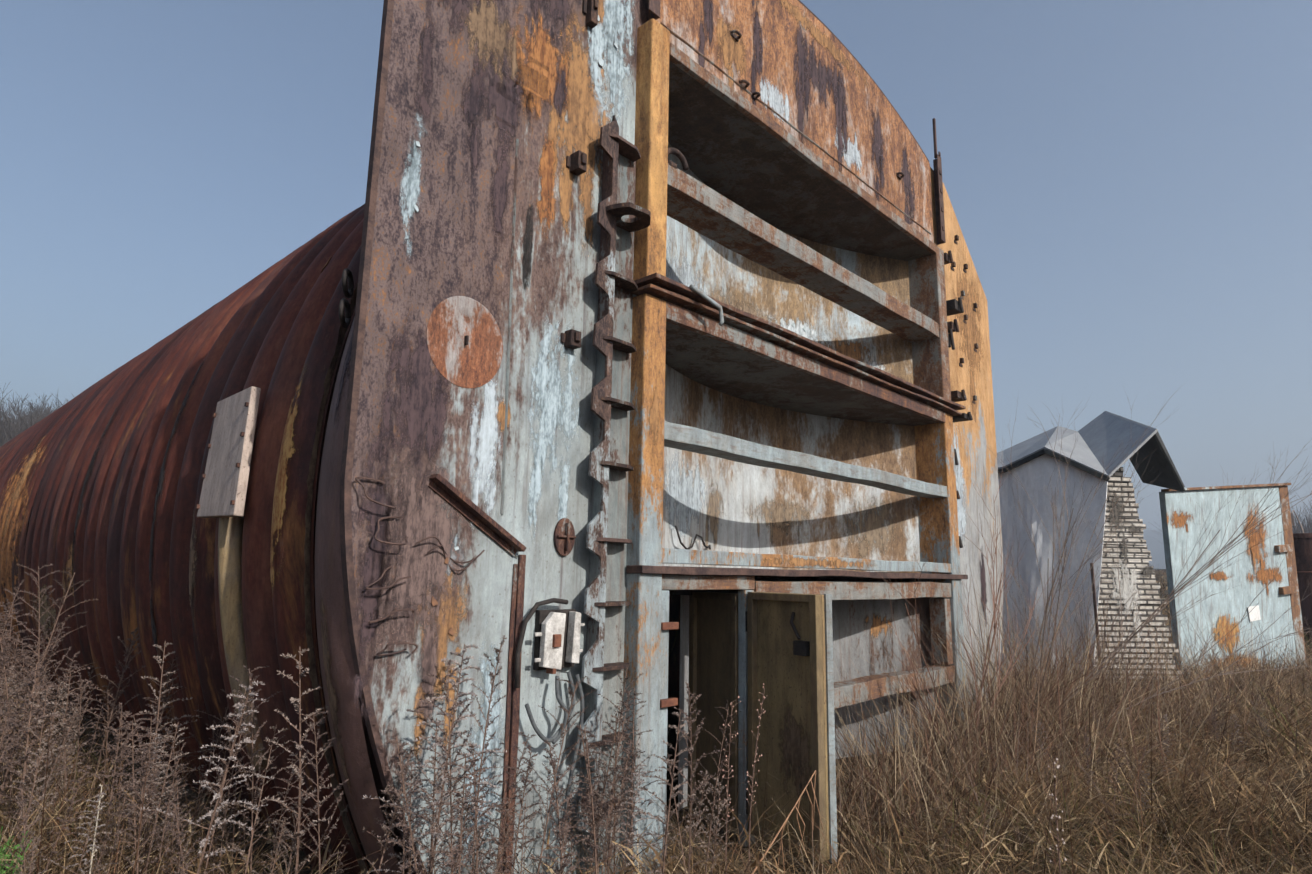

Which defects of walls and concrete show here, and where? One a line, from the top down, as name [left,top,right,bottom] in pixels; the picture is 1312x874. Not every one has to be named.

peeling [402,116,423,237]
rust [416,0,611,247]
peeling [588,0,633,121]
rust [794,24,848,172]
water stain [835,133,862,170]
rust [871,111,885,199]
rust [955,273,982,421]
peeling [270,382,301,587]
peeling [528,325,580,526]
rust [980,550,990,664]
rust [1243,505,1282,598]
peeling [464,644,504,847]